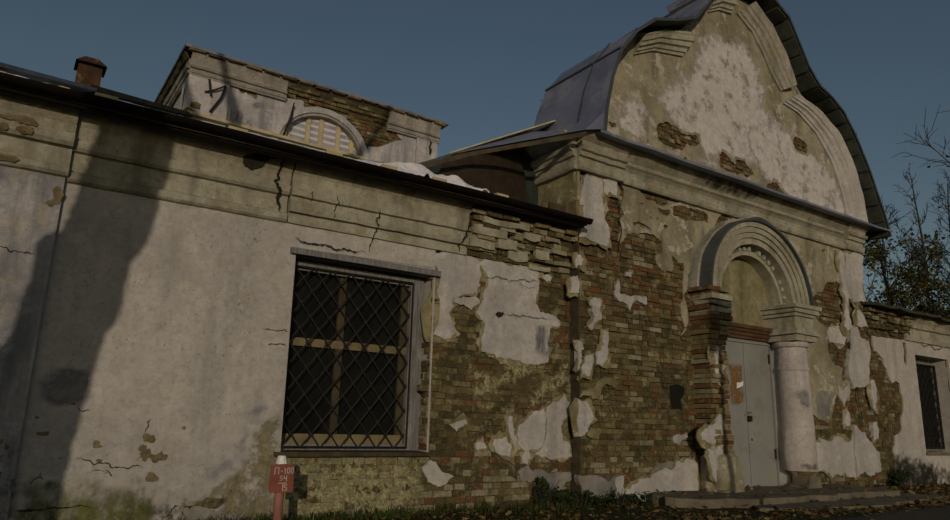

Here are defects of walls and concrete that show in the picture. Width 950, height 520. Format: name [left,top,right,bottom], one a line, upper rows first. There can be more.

peeling [608,34,844,214]
spalling [243,153,276,170]
crack [274,160,285,212]
crack [298,210,381,252]
leakage [43,369,90,404]
flaking render [182,172,731,520]
flaking render [813,249,902,487]
crack [75,458,143,476]
peeling [138,433,168,482]
crack [0,505,93,514]